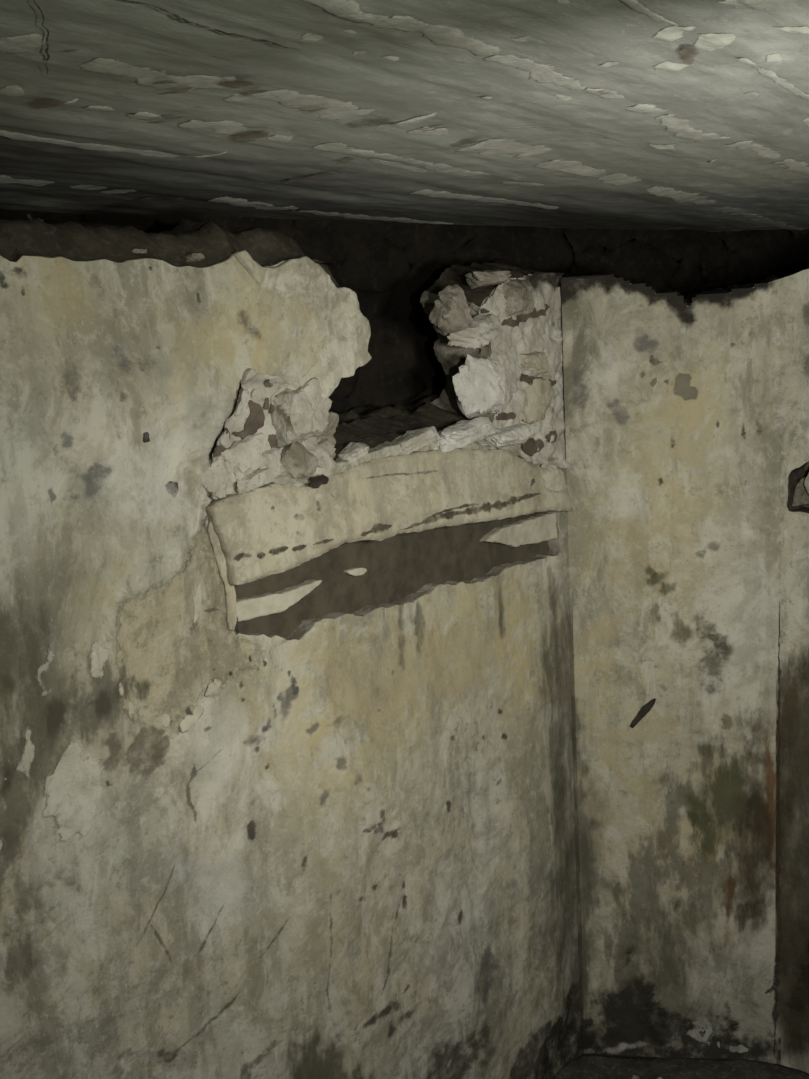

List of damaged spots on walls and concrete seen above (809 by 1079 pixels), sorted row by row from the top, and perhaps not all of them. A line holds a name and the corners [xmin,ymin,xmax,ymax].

peeling [653,26,736,51]
spalling [211,250,372,464]
flaking render [476,273,569,468]
spalling [792,462,809,507]
flaking render [4,726,36,780]
damp [105,728,169,772]
flaking render [43,738,105,841]
damp [364,810,398,840]
damp [510,620,809,1079]
damp [365,1002,411,1036]
damp [293,1032,372,1079]
damp [427,1026,490,1079]